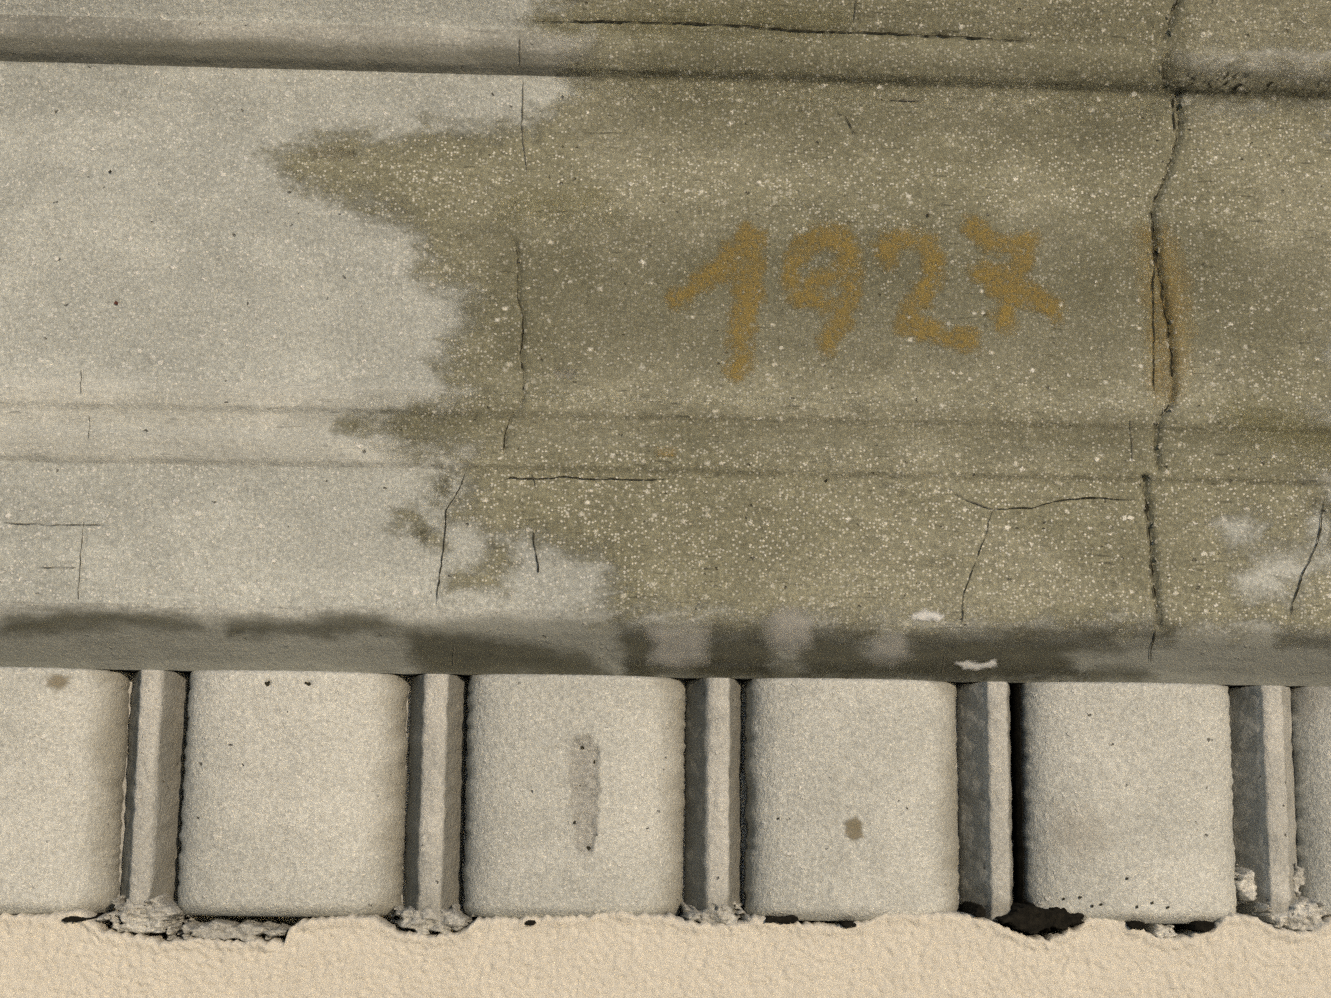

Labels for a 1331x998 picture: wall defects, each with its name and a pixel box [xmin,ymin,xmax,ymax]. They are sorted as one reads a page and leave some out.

crack [436,472,466,606]
crack [499,244,664,486]
damp [273,0,1331,658]
crack [949,1,1185,661]